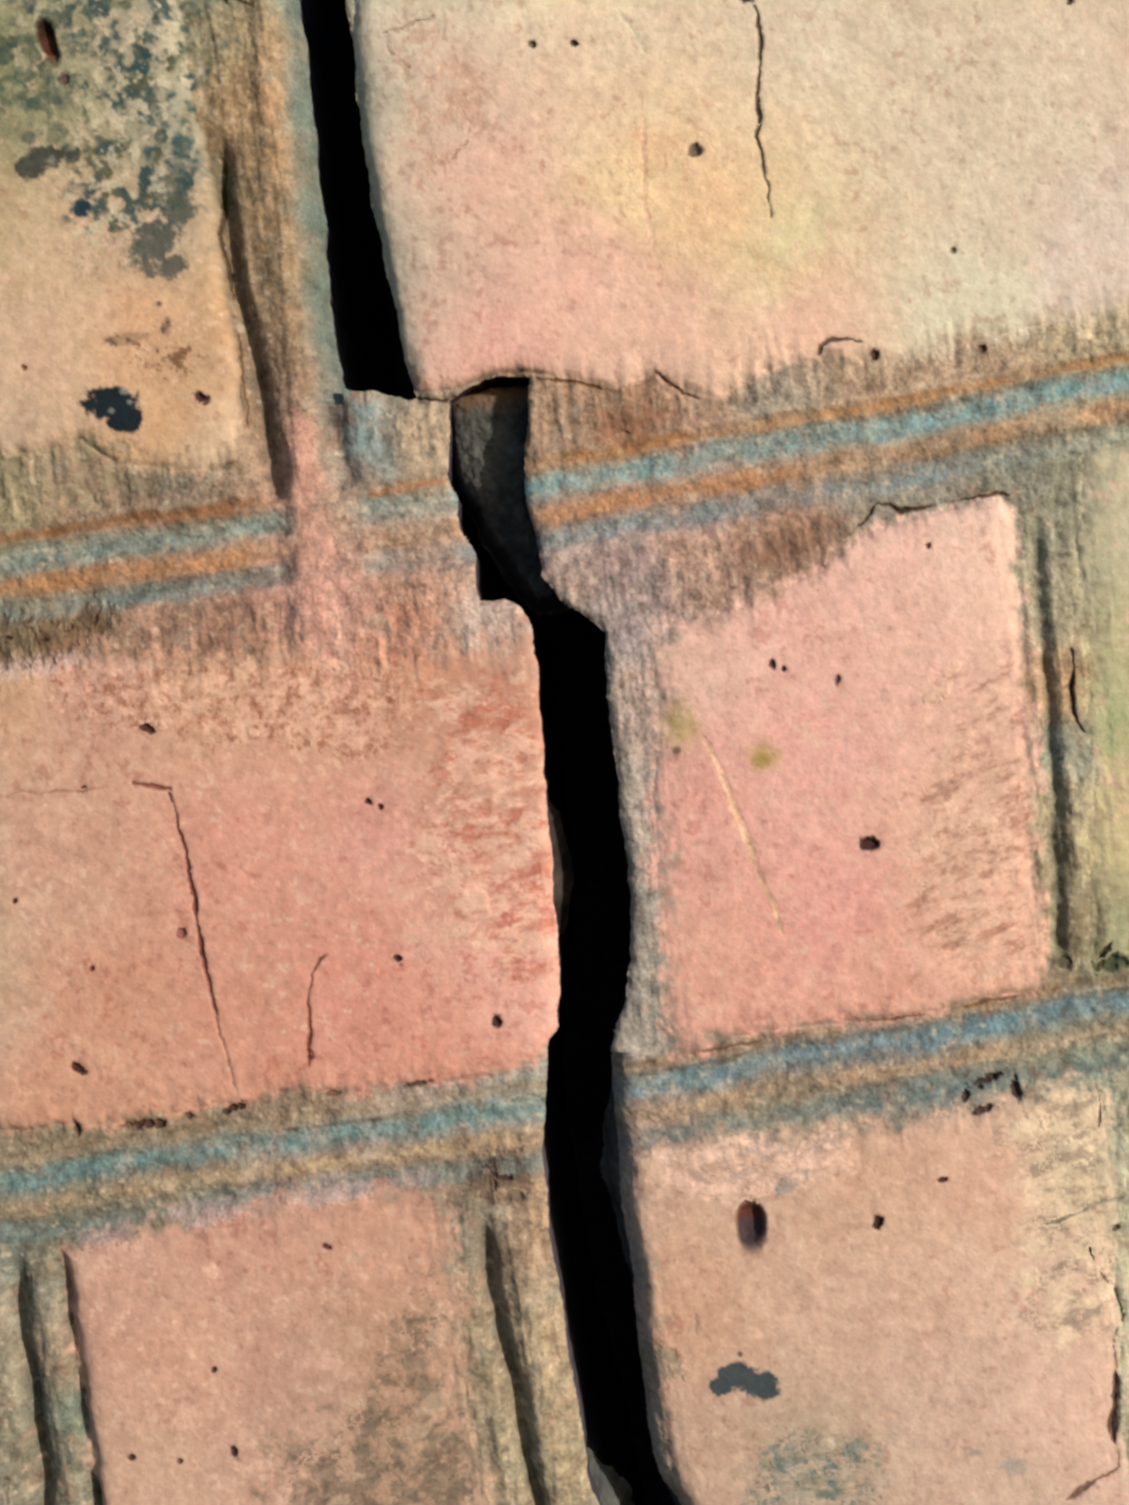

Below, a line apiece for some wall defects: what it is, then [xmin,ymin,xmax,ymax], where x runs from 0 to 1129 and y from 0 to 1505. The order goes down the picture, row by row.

leakage [0,0,265,437]
crack [215,156,251,431]
crack [221,0,258,8]
crack [654,370,702,400]
crack [738,0,773,220]
crack [299,0,681,1505]
crack [0,780,250,1140]